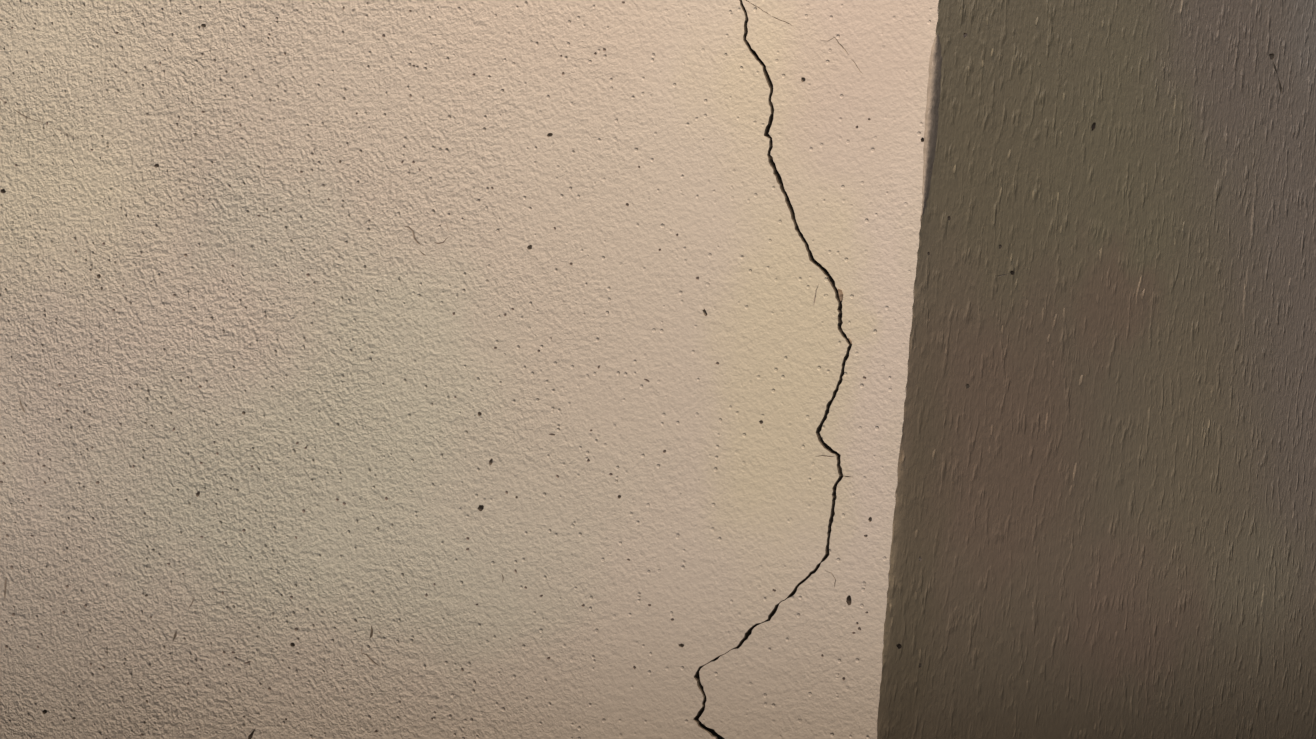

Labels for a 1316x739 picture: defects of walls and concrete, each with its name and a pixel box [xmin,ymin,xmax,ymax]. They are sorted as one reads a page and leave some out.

crack [693,0,852,739]